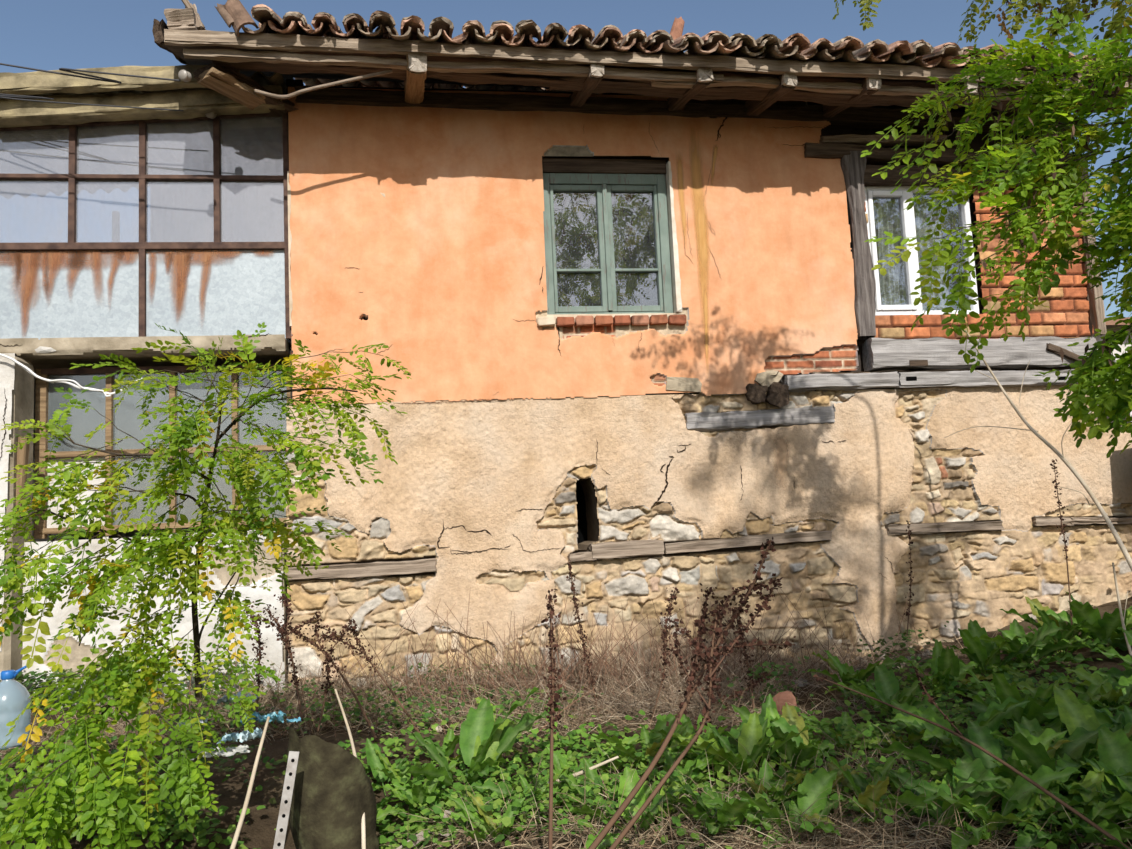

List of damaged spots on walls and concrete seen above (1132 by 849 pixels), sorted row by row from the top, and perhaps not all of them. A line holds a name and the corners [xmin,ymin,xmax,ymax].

rust [0,251,135,327]
rust [150,250,239,307]
spalling [536,161,690,340]
damp [678,146,717,359]
spalling [650,373,667,386]
spalling [699,426,789,437]
spalling [672,383,858,423]
spalling [764,344,859,374]
crack [653,444,691,506]
crack [437,509,559,555]
spalling [879,388,1132,648]
spalling [211,442,879,691]